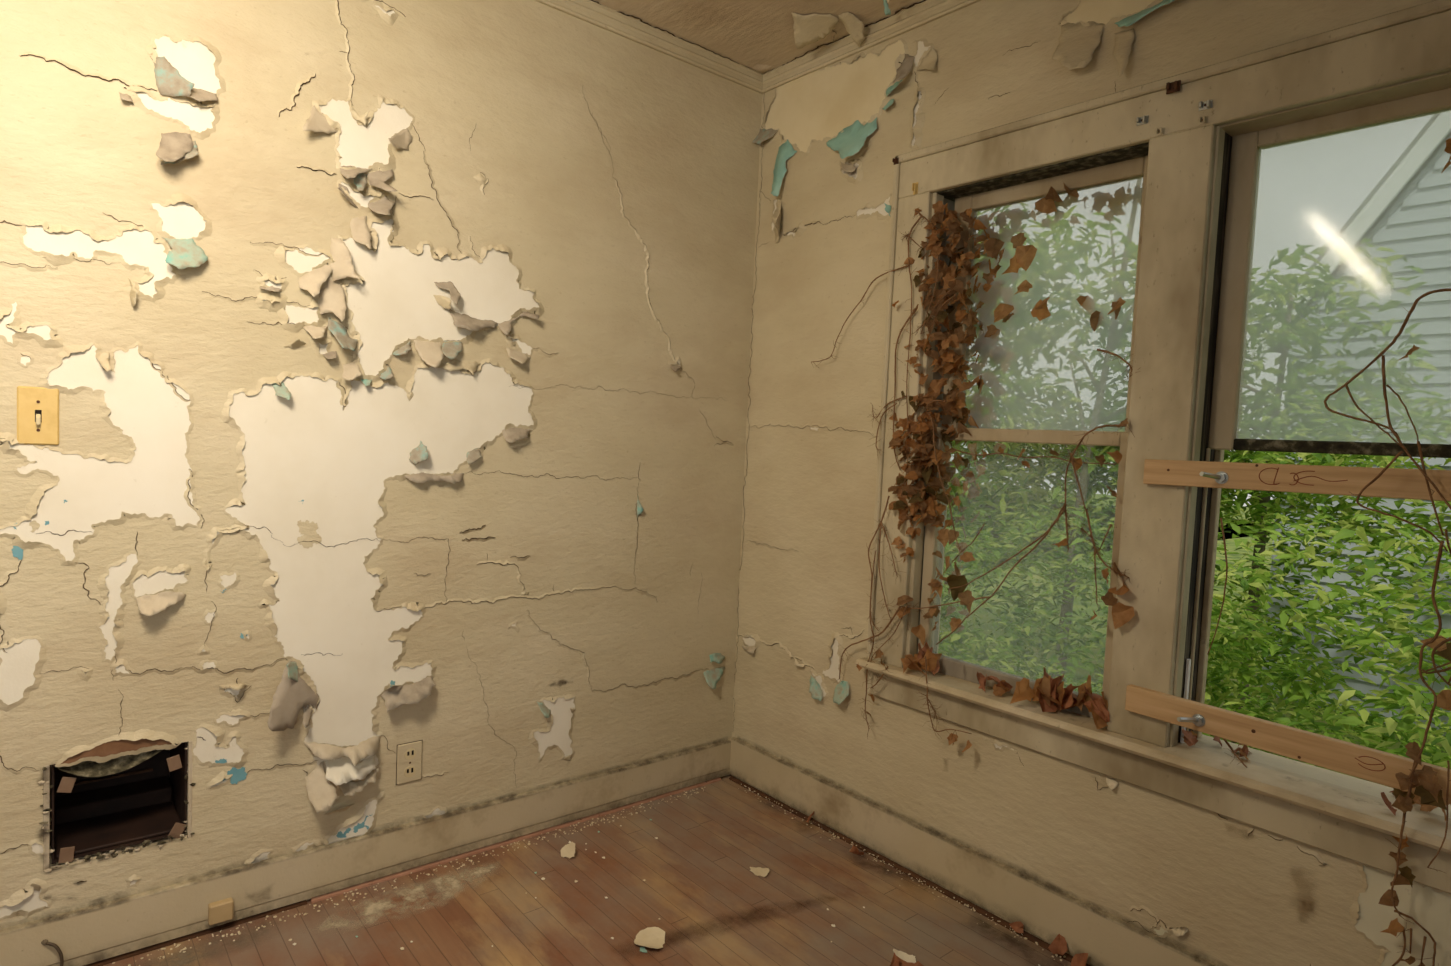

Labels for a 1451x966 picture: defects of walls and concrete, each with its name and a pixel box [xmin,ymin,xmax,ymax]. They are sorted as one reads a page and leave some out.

peeling [357,0,405,26]
peeling [1052,0,1175,92]
peeling [19,34,226,165]
peeling [743,12,938,196]
crack [0,257,121,272]
crack [377,0,926,781]
peeling [0,94,559,921]
crack [0,756,39,775]
crack [76,650,287,734]
peeling [528,694,577,763]
crack [1,839,45,856]
peeling [1349,862,1451,966]